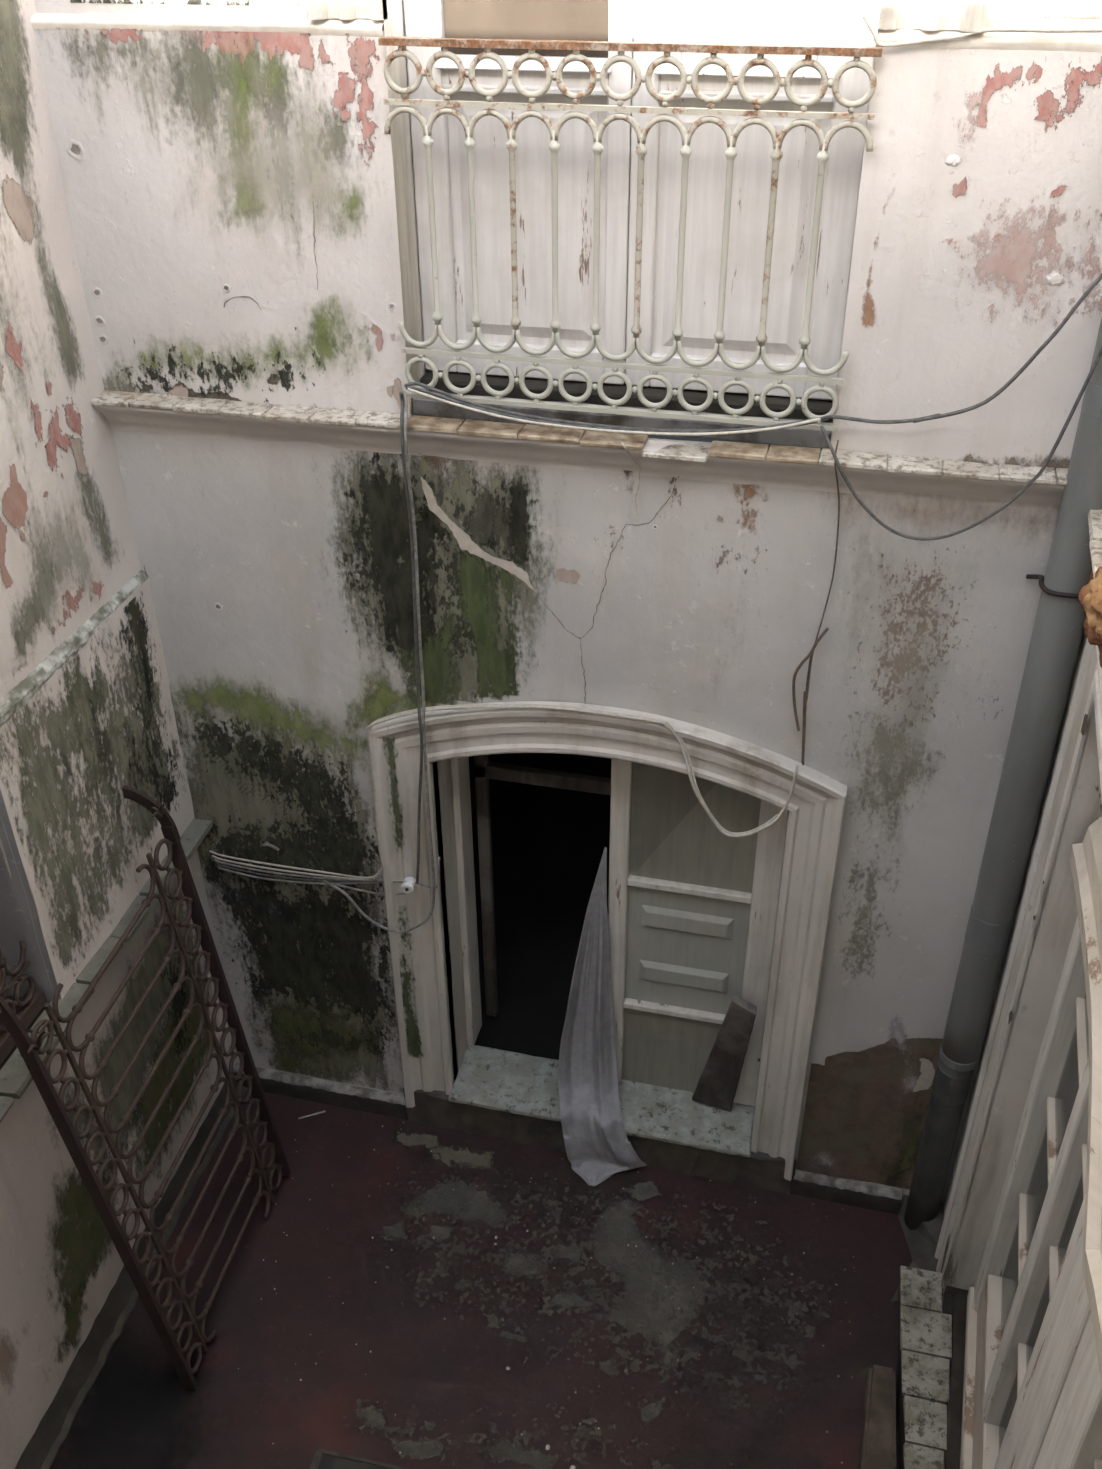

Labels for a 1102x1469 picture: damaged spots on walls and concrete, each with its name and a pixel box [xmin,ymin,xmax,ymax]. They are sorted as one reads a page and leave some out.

damp [0,0,33,179]
damp [69,31,347,231]
peeling [180,30,379,165]
peeling [958,57,1102,141]
damp [32,201,81,382]
peeling [30,381,88,479]
damp [102,299,344,402]
peeling [0,464,48,588]
damp [334,452,550,725]
crack [421,476,679,700]
damp [0,591,423,1088]
peeling [341,1131,836,1469]